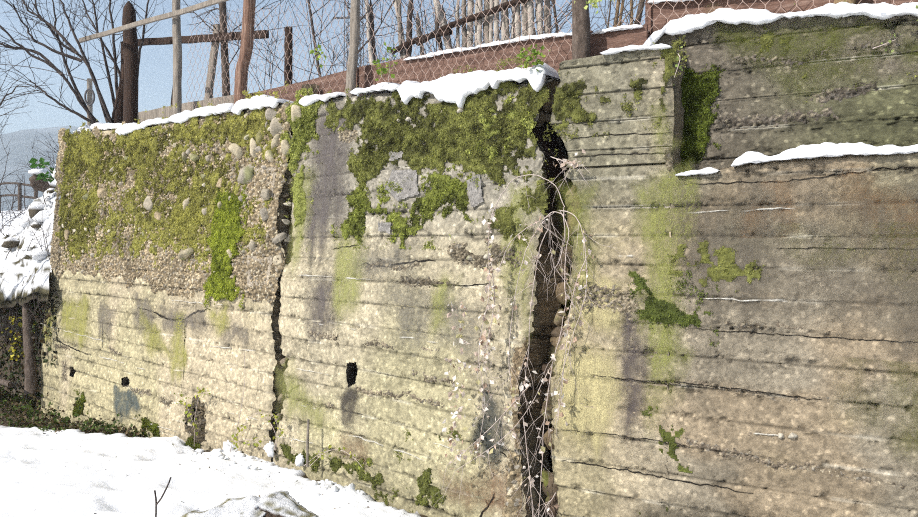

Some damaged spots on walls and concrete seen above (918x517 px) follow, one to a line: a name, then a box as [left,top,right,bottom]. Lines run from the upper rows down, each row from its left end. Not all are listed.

crack [301,84,319,96]
crack [282,177,295,248]
leakage [293,112,346,258]
crack [139,308,210,379]
leakage [300,242,396,332]
crack [479,105,747,517]
leakage [114,385,139,419]
crack [275,346,299,423]